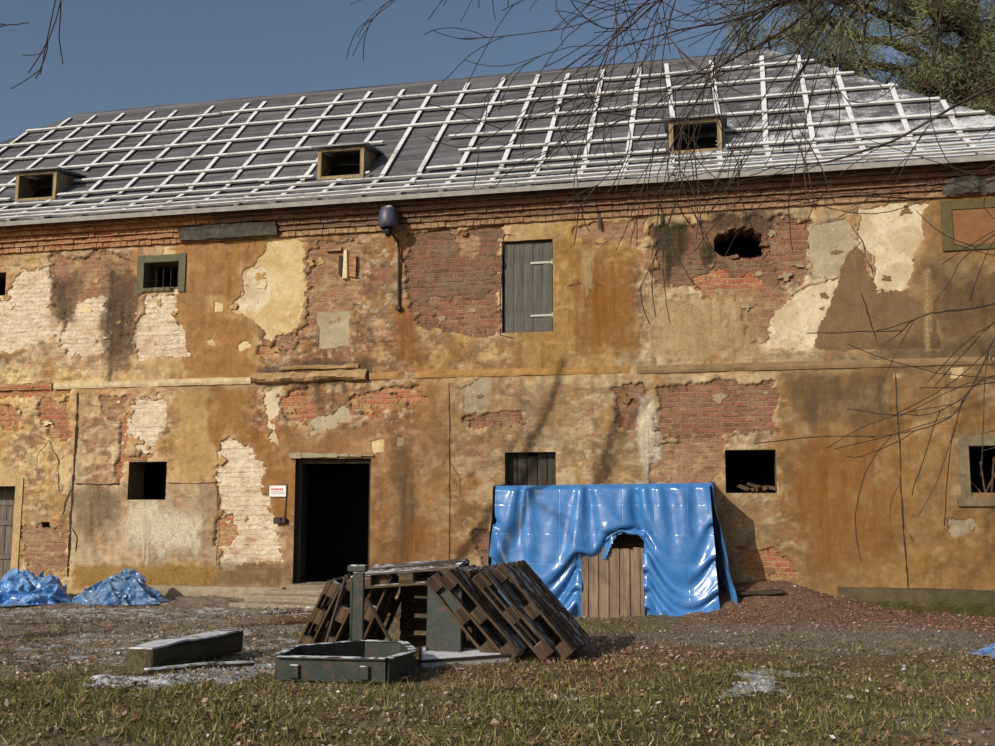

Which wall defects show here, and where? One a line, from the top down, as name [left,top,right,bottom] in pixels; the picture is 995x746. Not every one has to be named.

leakage [51,276,75,320]
spalling [0,249,190,361]
leakage [100,271,137,377]
peeling [163,244,176,255]
peeling [214,237,309,359]
peeling [317,311,351,349]
spalling [573,201,929,353]
spalling [100,392,167,484]
peeling [459,378,527,430]
spalling [611,378,782,484]
spalling [214,437,284,570]
spalling [472,529,490,566]